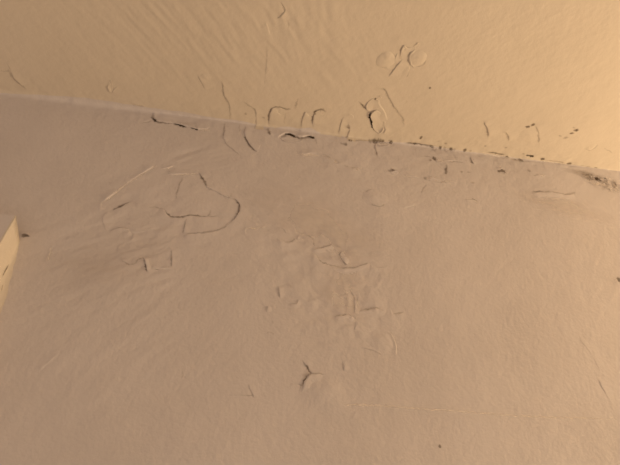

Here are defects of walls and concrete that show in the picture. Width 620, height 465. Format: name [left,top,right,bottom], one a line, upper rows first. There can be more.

crack [268,107,325,143]